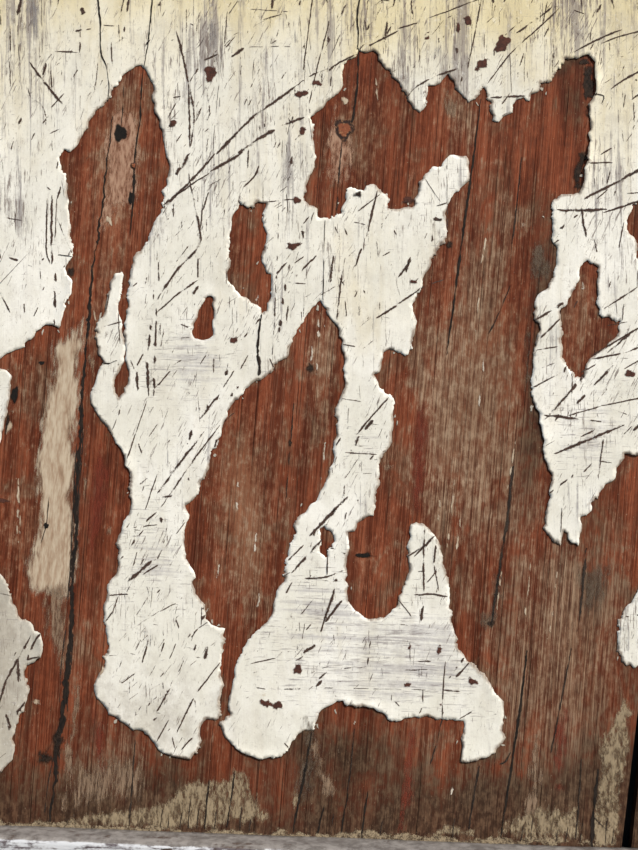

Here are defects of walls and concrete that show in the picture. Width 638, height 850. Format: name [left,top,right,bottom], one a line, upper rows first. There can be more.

peeling [0,65,170,721]
crack [42,0,153,825]
peeling [204,66,217,82]
peeling [227,202,271,313]
peeling [0,296,612,847]
peeling [303,50,638,848]
peeling [494,35,511,52]